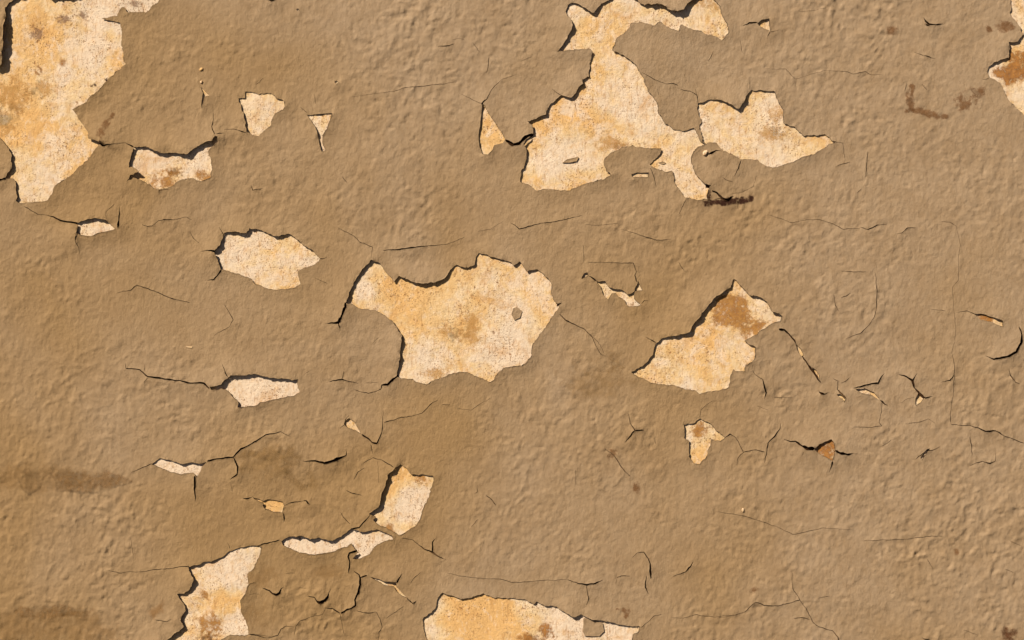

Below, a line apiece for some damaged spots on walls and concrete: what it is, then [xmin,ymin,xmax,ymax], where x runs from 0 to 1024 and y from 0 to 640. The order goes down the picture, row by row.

peeling [0,0,159,204]
peeling [479,0,835,204]
crack [328,302,347,328]
peeling [342,253,561,386]
peeling [632,278,784,394]
crack [779,328,955,411]
crack [989,328,1022,384]
crack [194,432,283,499]
peeling [282,462,434,562]
crack [304,403,432,632]
crack [726,430,852,469]
peeling [163,546,261,640]